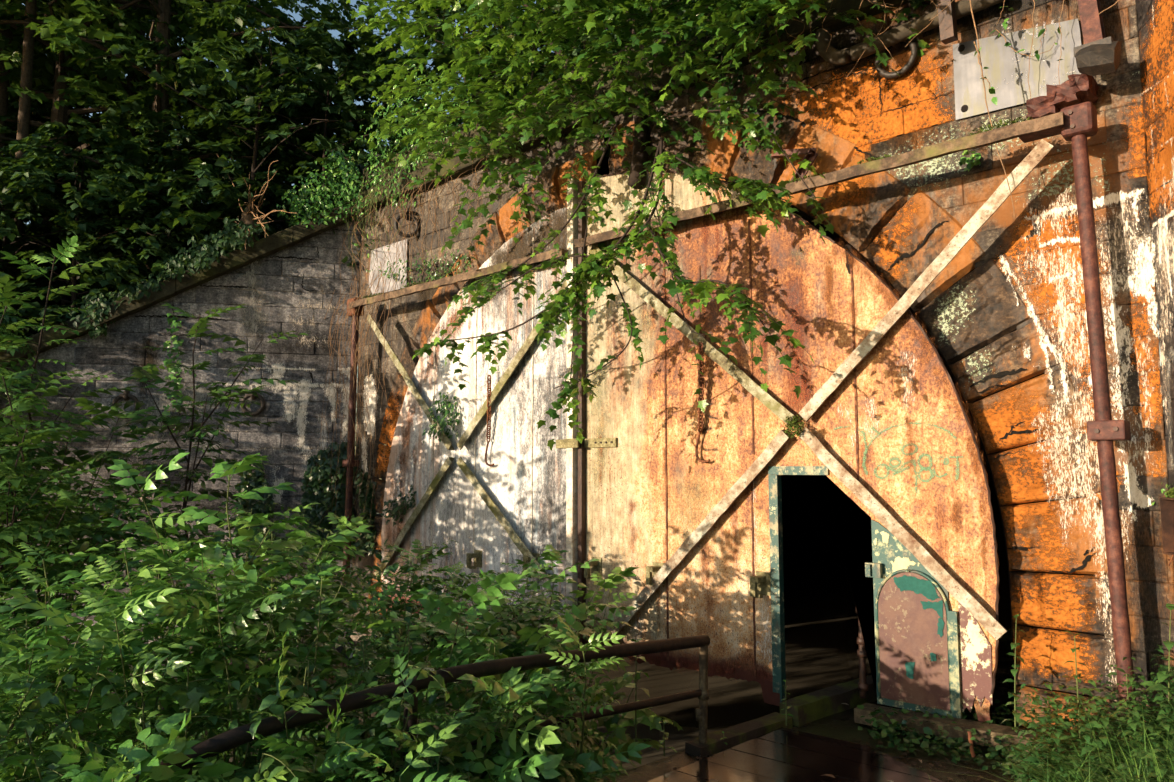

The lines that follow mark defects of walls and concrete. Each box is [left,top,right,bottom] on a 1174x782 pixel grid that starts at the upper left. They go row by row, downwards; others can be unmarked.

leakage [956,0,1078,31]
leakage [1100,0,1124,41]
corrosion [824,246,896,330]
leakage [135,333,247,448]
leakage [221,363,378,504]
corrosion [384,295,492,544]
corrosion [783,292,811,412]
leakage [999,188,1117,686]
leakage [1093,127,1174,697]
corrosion [965,437,992,568]
peeling [874,531,944,638]
peeling [905,662,915,679]